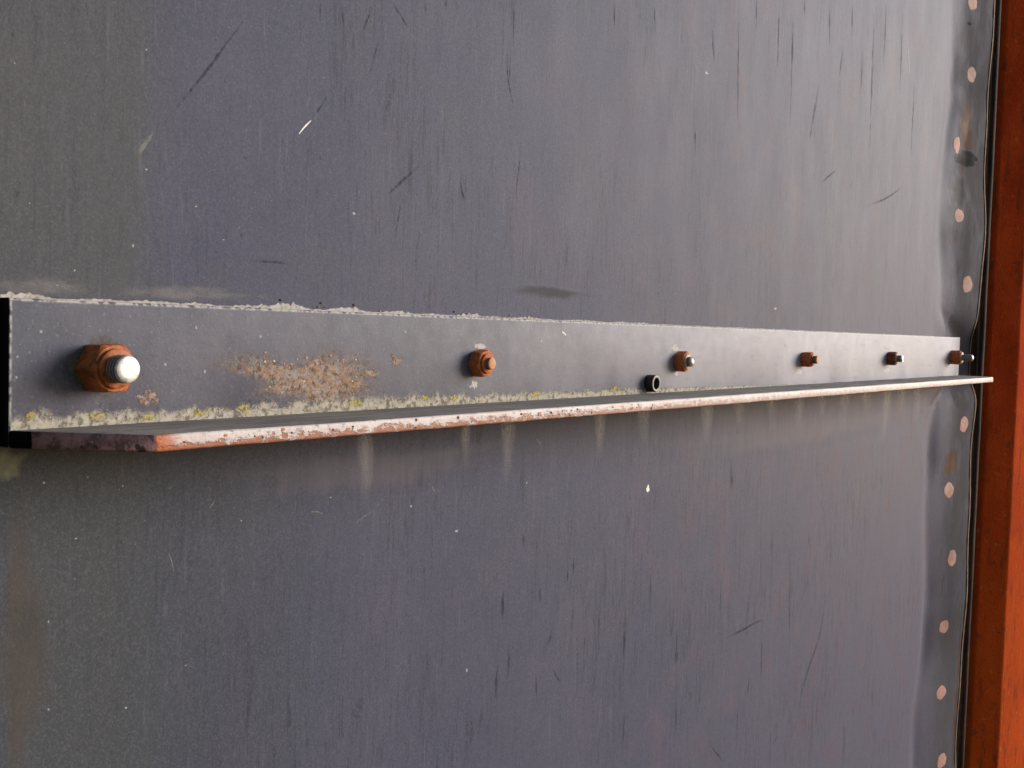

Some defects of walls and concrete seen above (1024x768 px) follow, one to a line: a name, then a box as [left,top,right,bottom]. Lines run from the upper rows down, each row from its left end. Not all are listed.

corrosion [137,390,158,405]
corrosion [234,351,378,404]